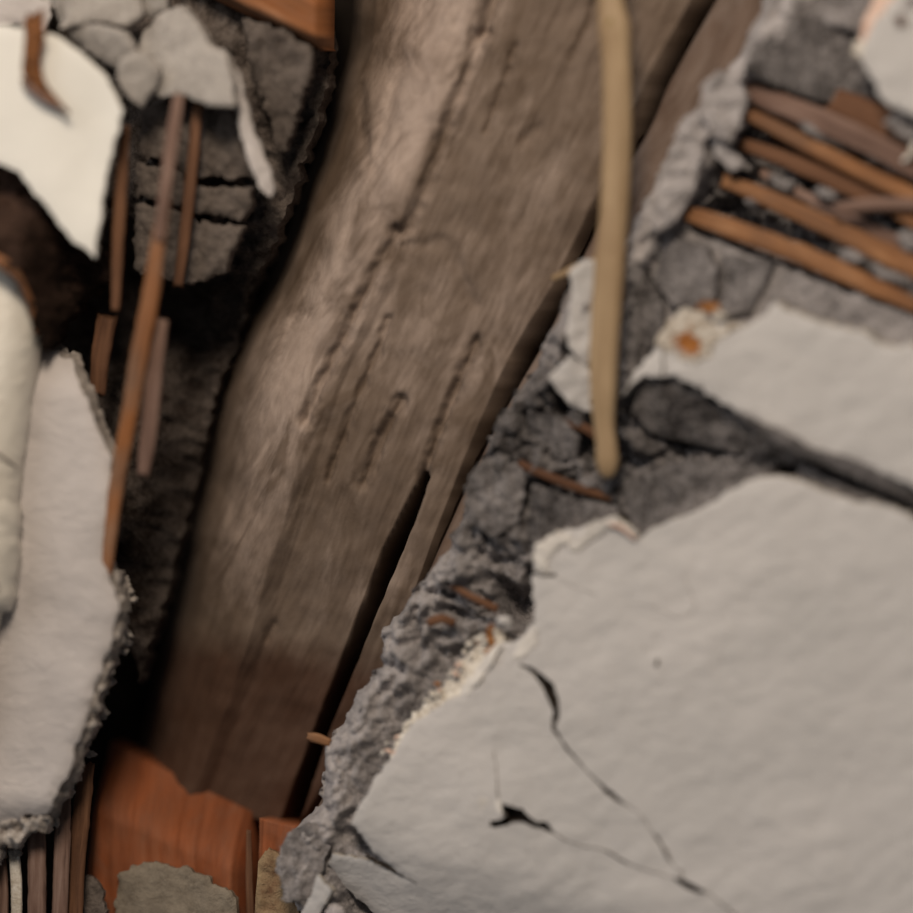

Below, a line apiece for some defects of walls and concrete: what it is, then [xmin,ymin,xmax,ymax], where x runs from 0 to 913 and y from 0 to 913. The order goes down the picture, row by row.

crack [895,15,906,27]
spalling [0,0,339,865]
spalling [275,0,913,913]
rust [656,301,739,363]
crack [489,664,734,913]